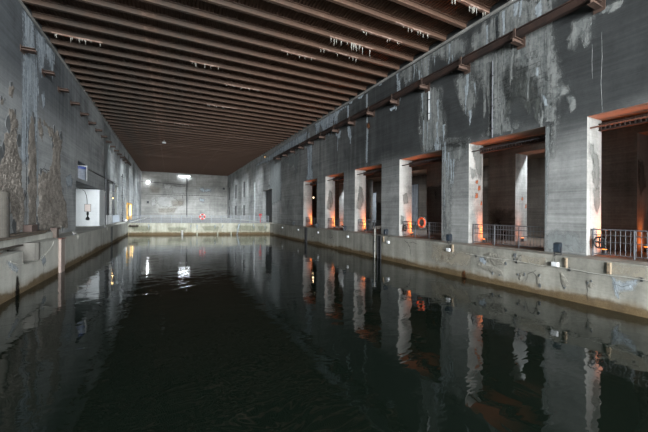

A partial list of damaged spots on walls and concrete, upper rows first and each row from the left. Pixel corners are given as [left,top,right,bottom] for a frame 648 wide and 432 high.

water stain [52,32,103,44]
water stain [319,36,375,59]
water stain [360,29,403,45]
water stain [395,0,554,99]
spalling [0,81,68,233]
water stain [419,87,470,237]
water stain [456,22,585,253]